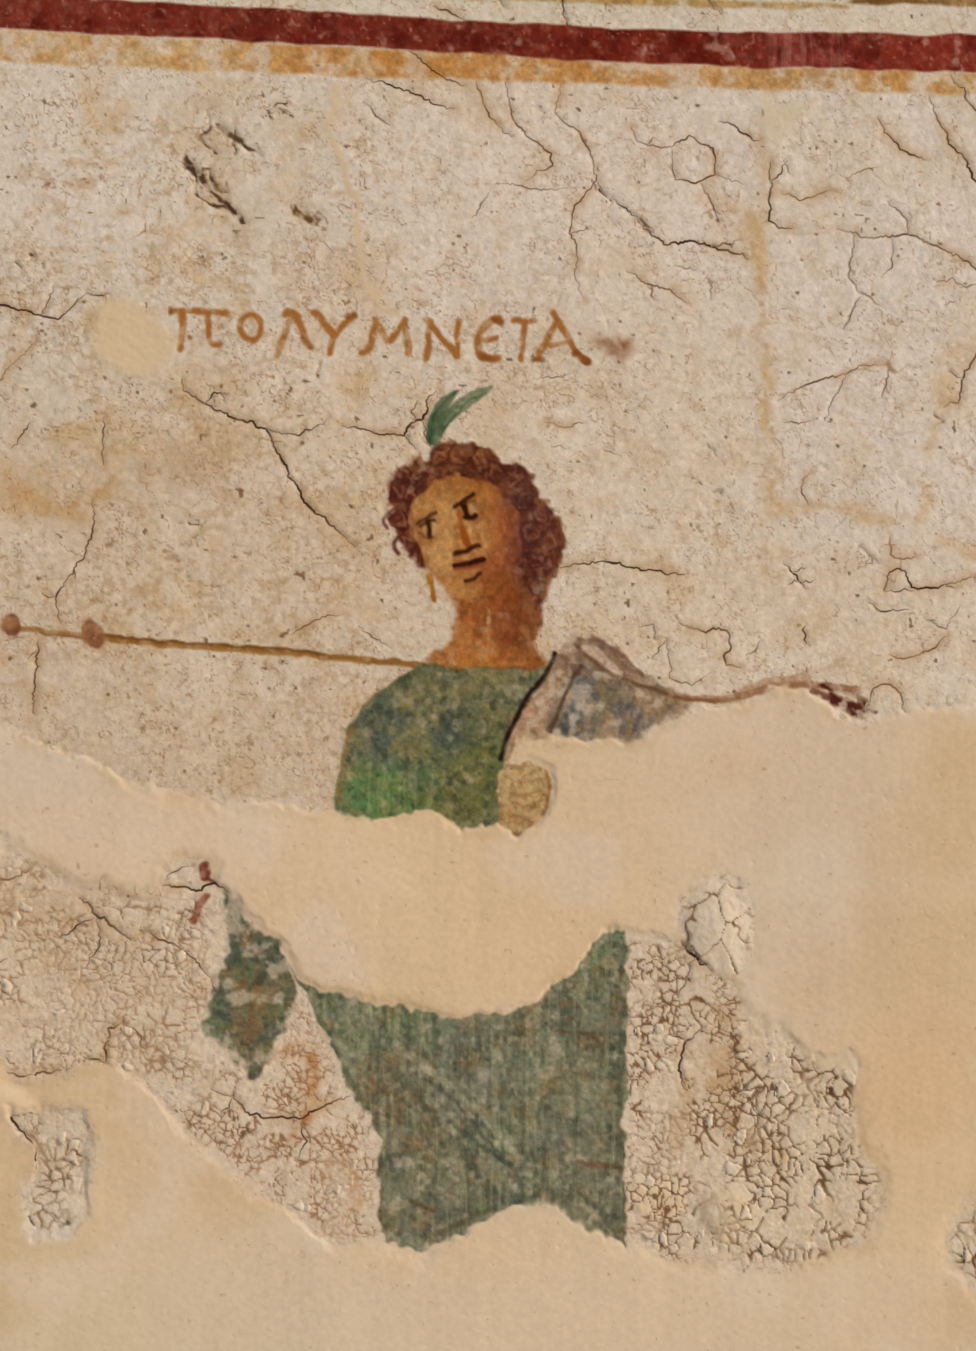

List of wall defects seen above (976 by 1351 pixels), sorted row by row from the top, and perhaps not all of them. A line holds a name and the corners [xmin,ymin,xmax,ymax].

crack [434,6,463,20]
crack [363,50,976,305]
crack [837,201,976,329]
crack [0,285,111,449]
crack [181,378,437,548]
crack [777,363,890,425]
crack [943,353,976,408]
crack [28,499,96,714]
spalling [815,681,879,722]
crack [0,856,380,1246]
crack [621,881,884,1268]
crack [947,1207,976,1282]